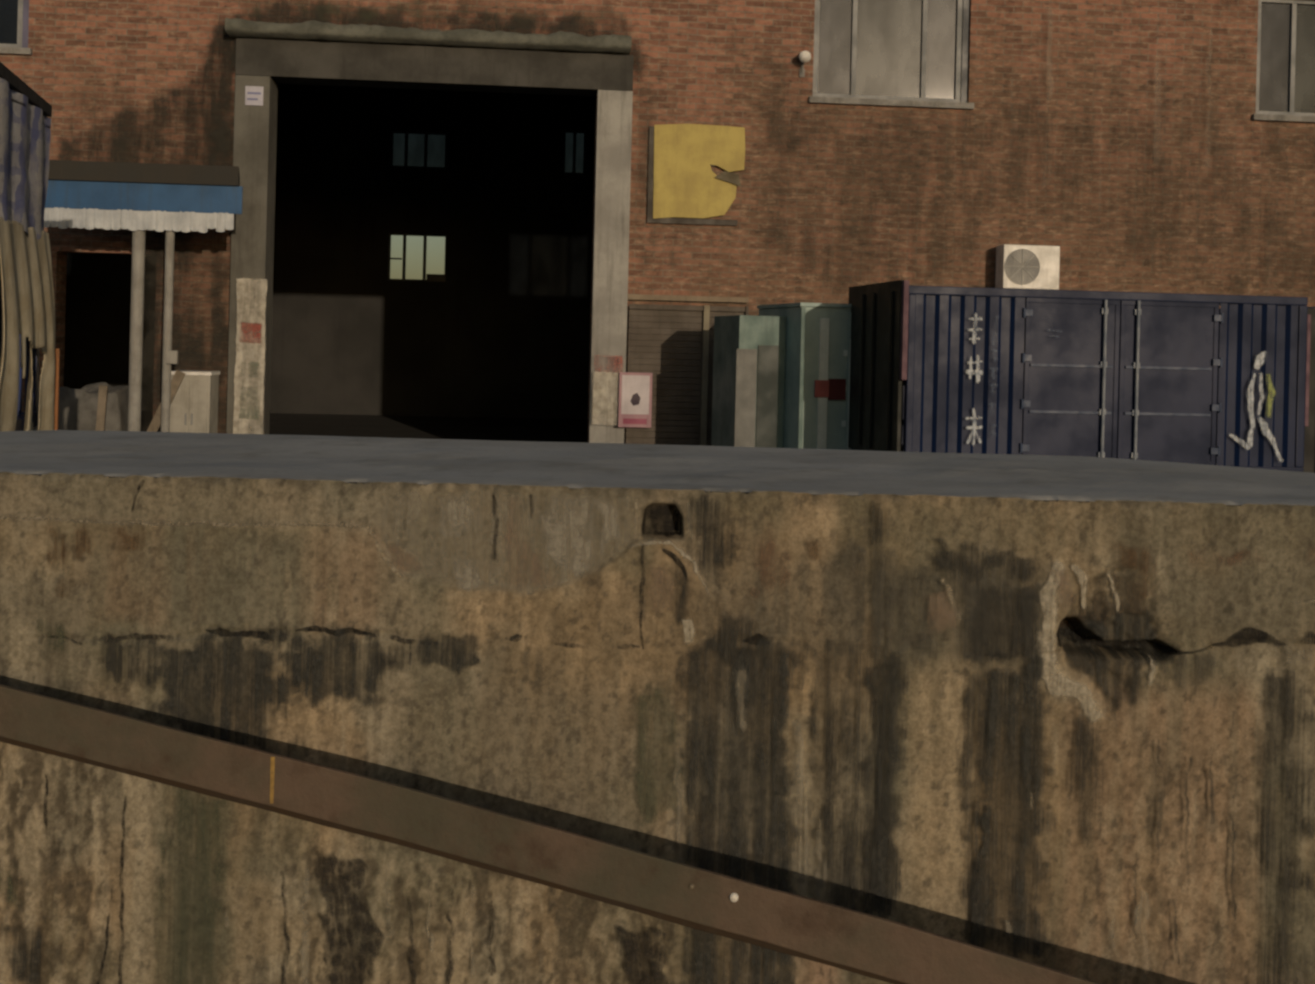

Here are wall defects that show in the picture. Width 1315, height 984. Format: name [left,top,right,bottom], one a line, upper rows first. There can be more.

crack [50,633,165,643]
damp [102,627,480,746]
crack [206,626,425,644]
crack [622,540,705,649]
crack [744,634,765,645]
damp [672,495,907,916]
damp [936,539,1054,958]
spalling [1032,562,1207,722]
crack [1212,628,1315,647]
damp [1261,670,1315,984]
damp [684,927,795,984]